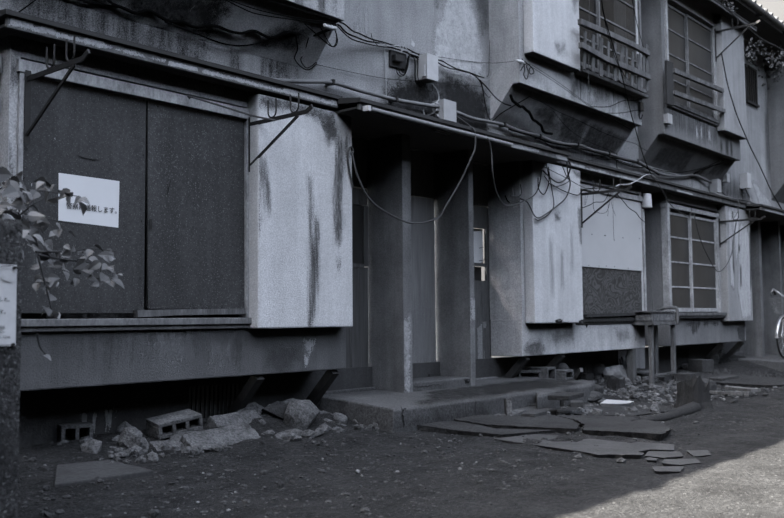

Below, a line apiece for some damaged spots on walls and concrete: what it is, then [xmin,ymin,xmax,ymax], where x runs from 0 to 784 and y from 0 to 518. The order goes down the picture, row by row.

water stain [381,0,491,131]
water stain [259,94,348,245]
water stain [308,184,320,323]
water stain [268,337,316,372]